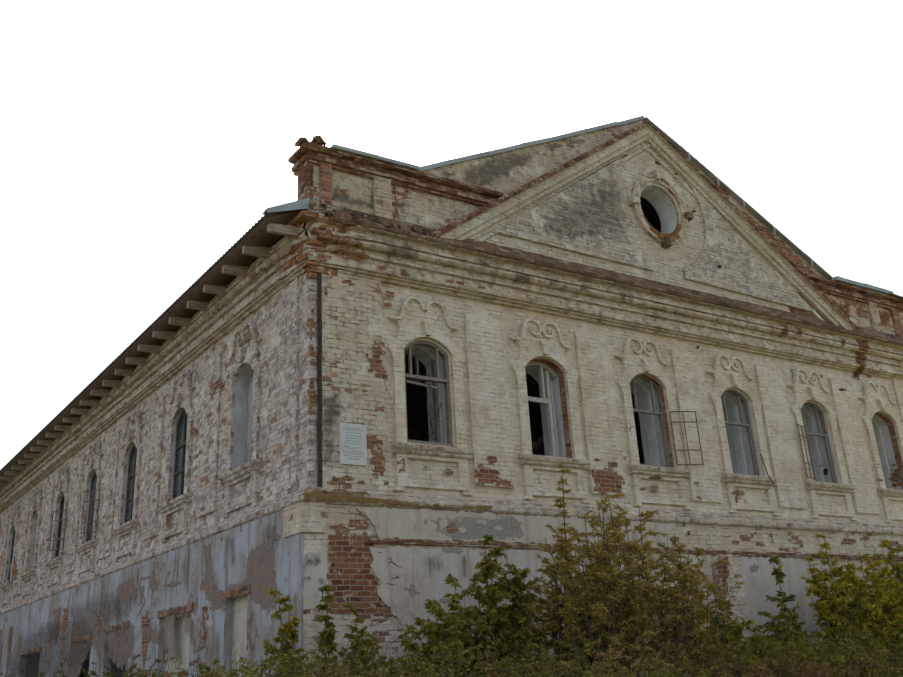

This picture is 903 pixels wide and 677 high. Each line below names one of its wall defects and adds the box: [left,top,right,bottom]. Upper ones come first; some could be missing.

peeling [345,341,388,393]
peeling [327,475,365,485]
peeling [367,434,389,485]
peeling [474,456,513,489]
peeling [591,458,625,495]
peeling [424,515,524,554]
peeling [227,534,280,611]
spalling [326,511,397,623]
peeling [0,626,22,677]
peeling [42,576,209,677]